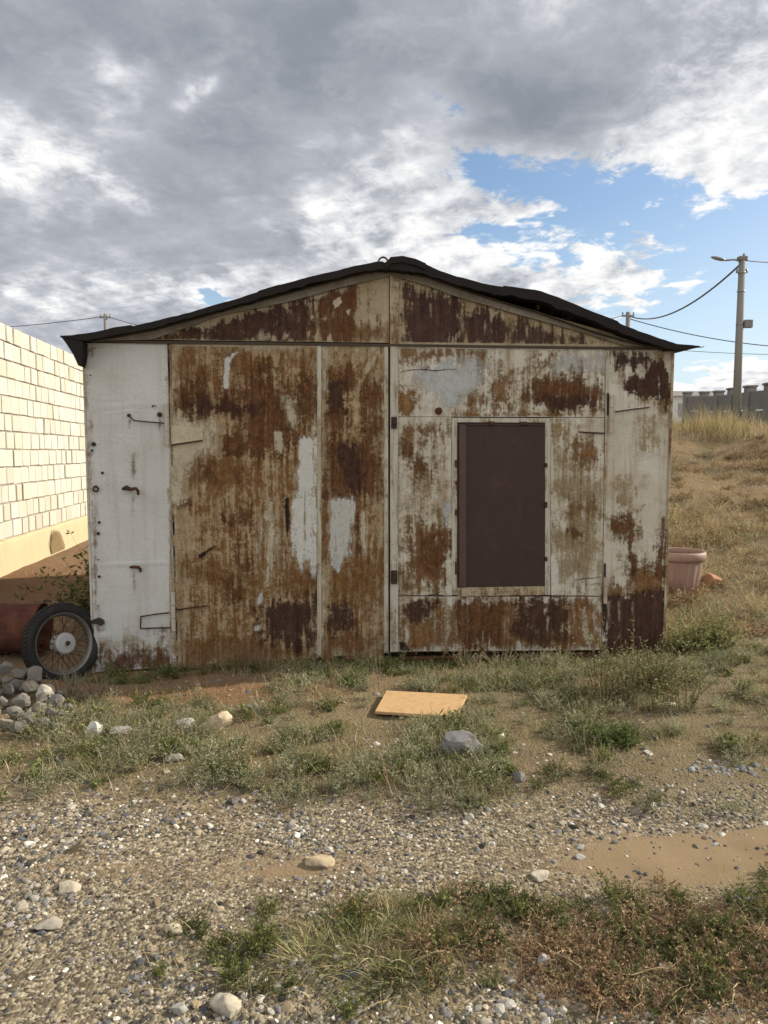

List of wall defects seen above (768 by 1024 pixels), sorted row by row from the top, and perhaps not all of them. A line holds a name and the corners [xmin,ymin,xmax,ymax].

rust [608,350,671,416]
rust [94,282,605,673]
rust [398,501,666,658]